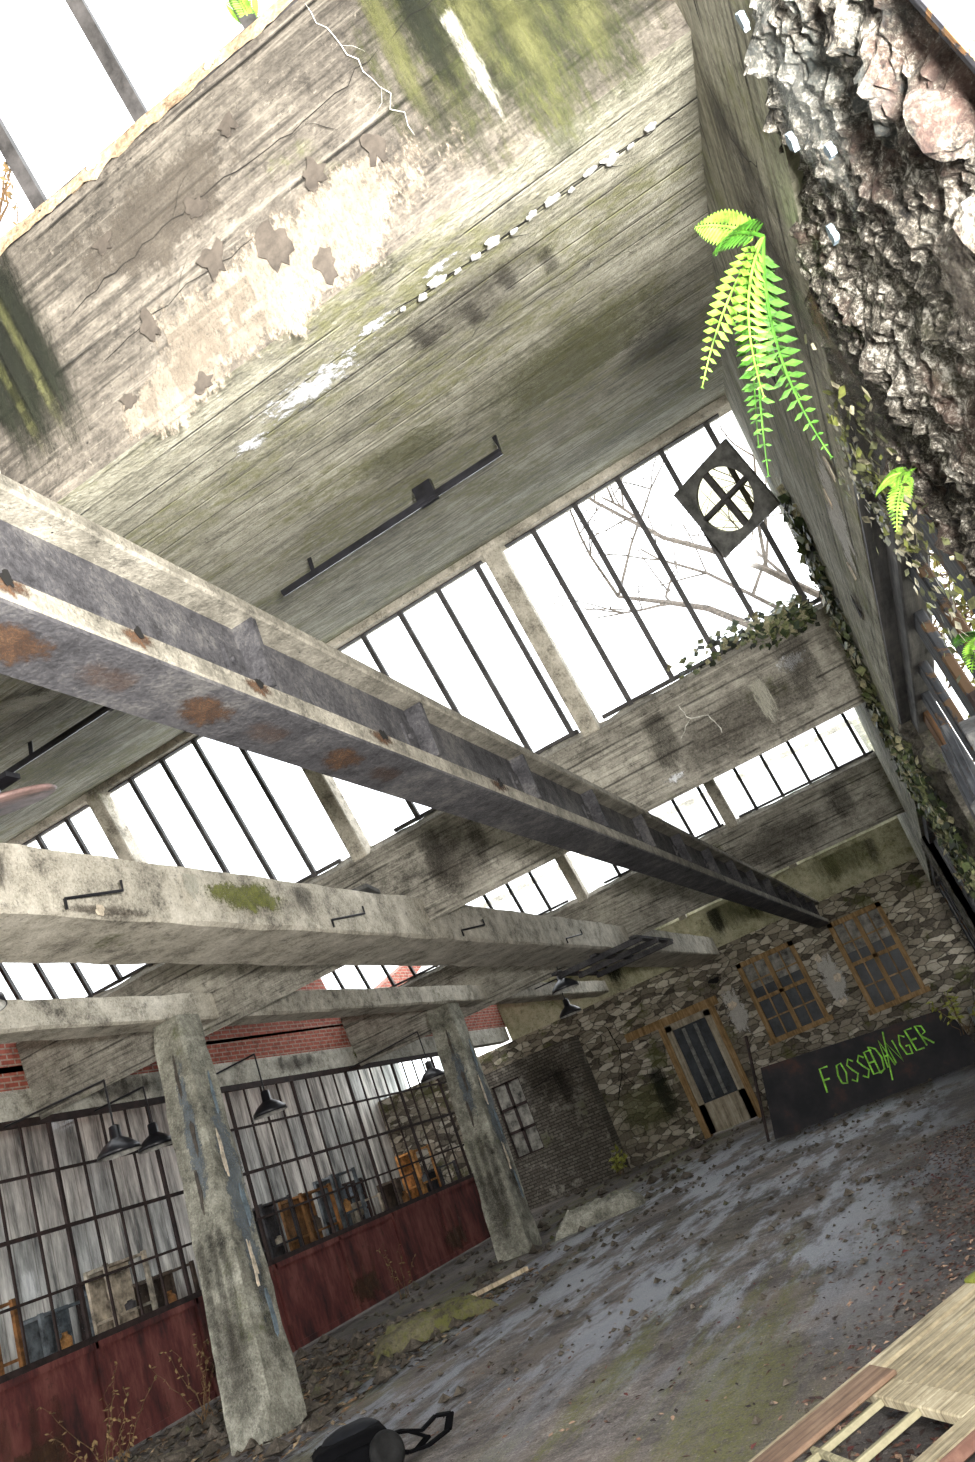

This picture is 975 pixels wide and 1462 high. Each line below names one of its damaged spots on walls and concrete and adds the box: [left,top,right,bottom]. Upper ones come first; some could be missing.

crack [70,0,432,317]
leakage [357,0,643,169]
leakage [0,252,72,450]
crack [101,240,250,364]
peeling [70,109,464,440]
rust [0,622,55,665]
rust [180,697,235,727]
leakage [184,874,288,916]